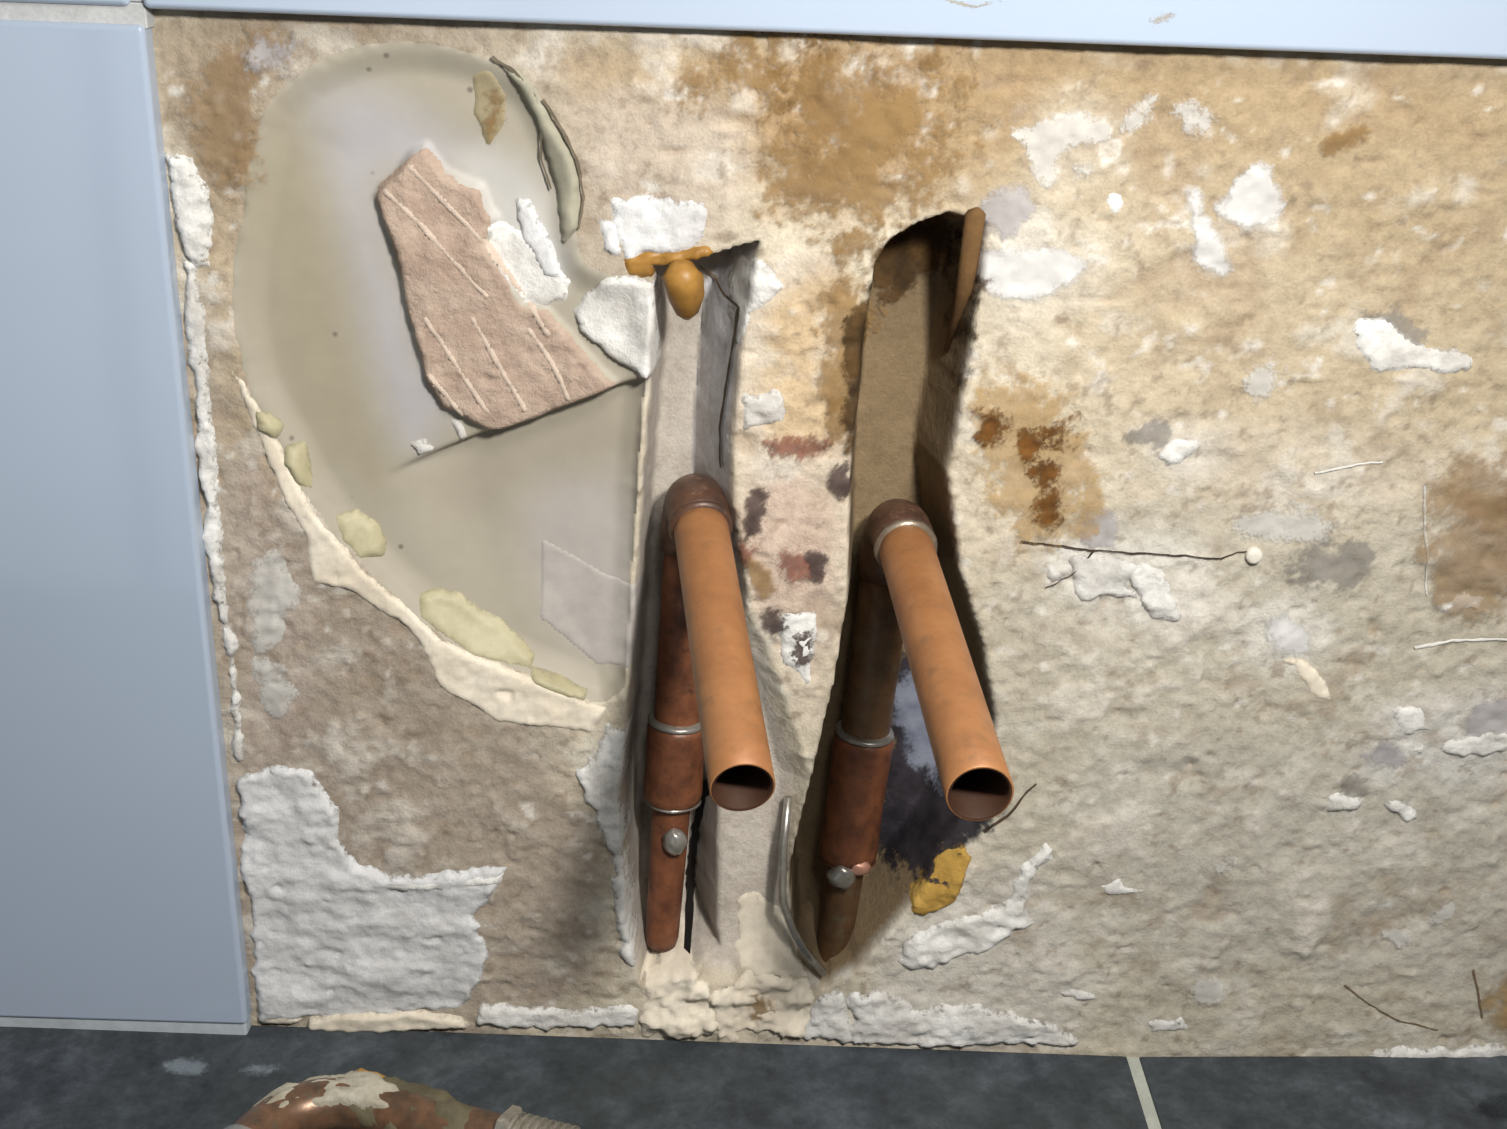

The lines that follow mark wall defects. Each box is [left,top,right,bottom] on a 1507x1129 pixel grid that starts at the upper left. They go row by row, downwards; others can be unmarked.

spalling [1352,317,1473,374]
spalling [232,41,664,966]
rust [972,407,1081,531]
peeling [260,1009,470,1033]